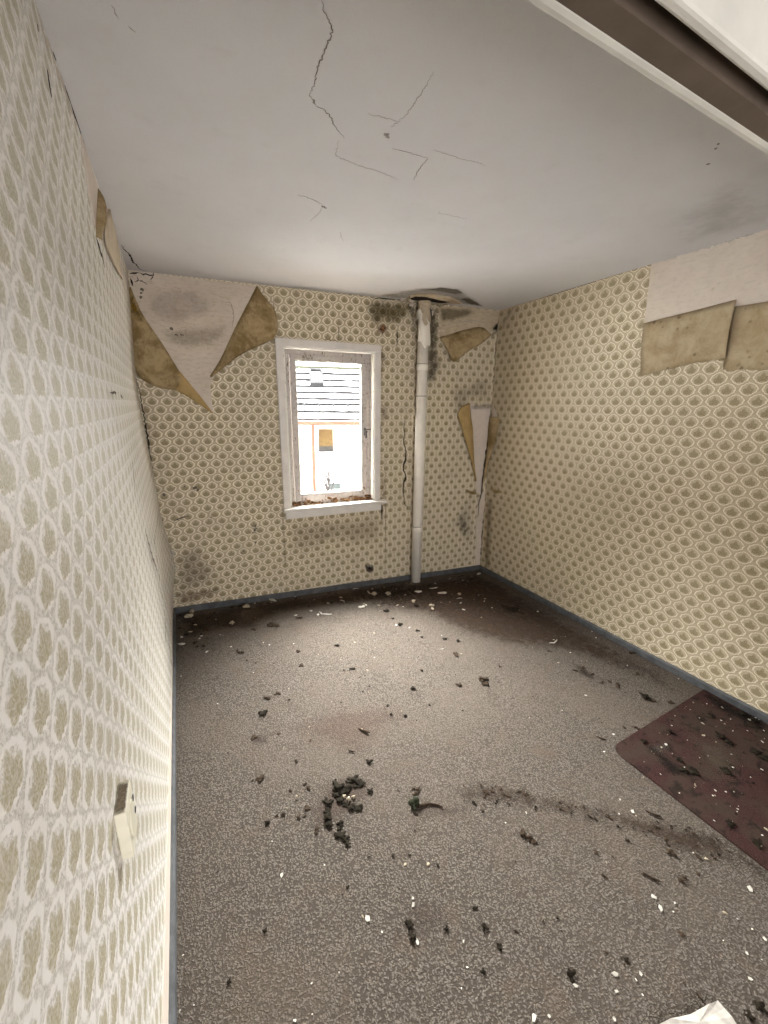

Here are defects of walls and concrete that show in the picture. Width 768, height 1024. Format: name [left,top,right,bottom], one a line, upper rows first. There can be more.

crack [309,0,482,180]
water stain [371,304,414,322]
spalling [399,288,481,316]
crack [380,422,408,509]